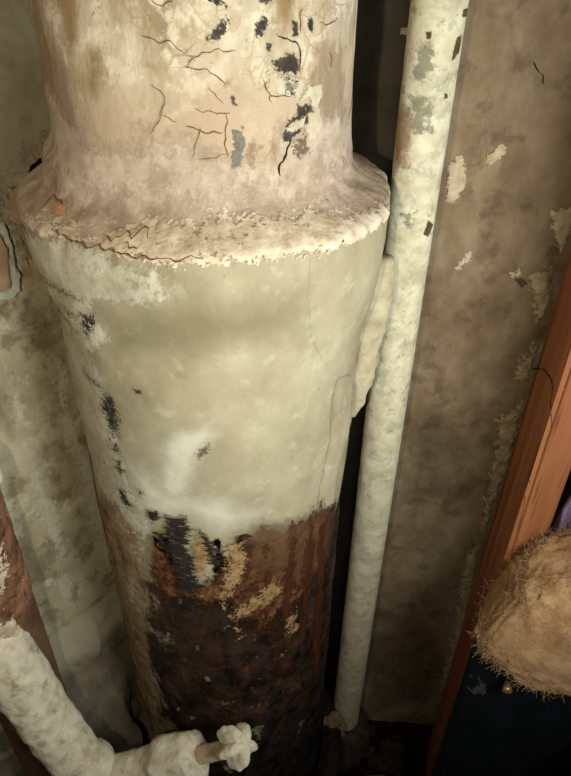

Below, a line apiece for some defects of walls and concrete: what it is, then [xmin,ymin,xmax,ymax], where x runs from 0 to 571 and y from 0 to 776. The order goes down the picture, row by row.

crack [142,36,232,159]
peeling [206,0,230,44]
peeling [232,126,246,169]
peeling [254,16,323,175]
peeling [452,35,462,61]
crack [1,158,43,267]
spalling [515,265,554,324]
peeling [21,194,390,619]
corrosion [95,485,340,776]